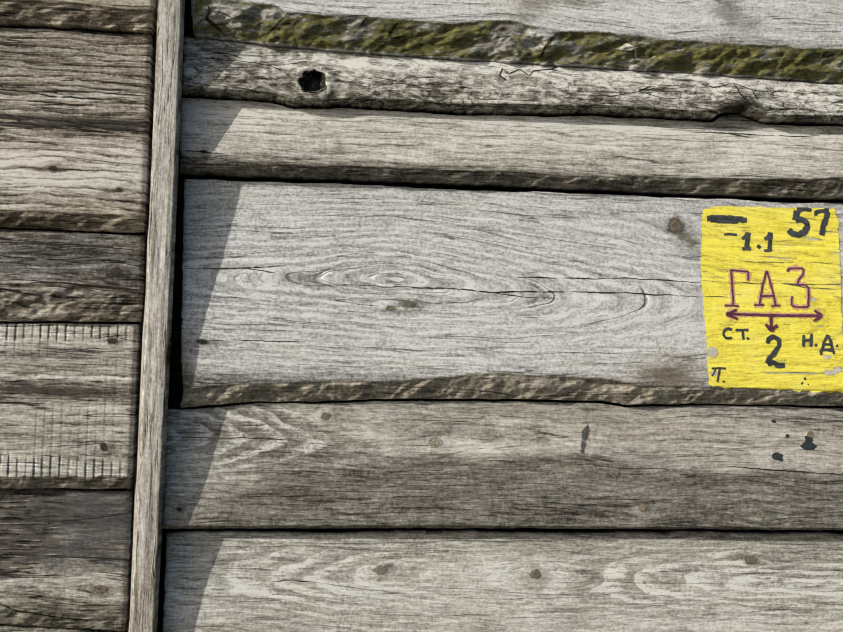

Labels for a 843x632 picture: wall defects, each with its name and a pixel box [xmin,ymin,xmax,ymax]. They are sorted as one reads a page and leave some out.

crack [484,28,561,80]